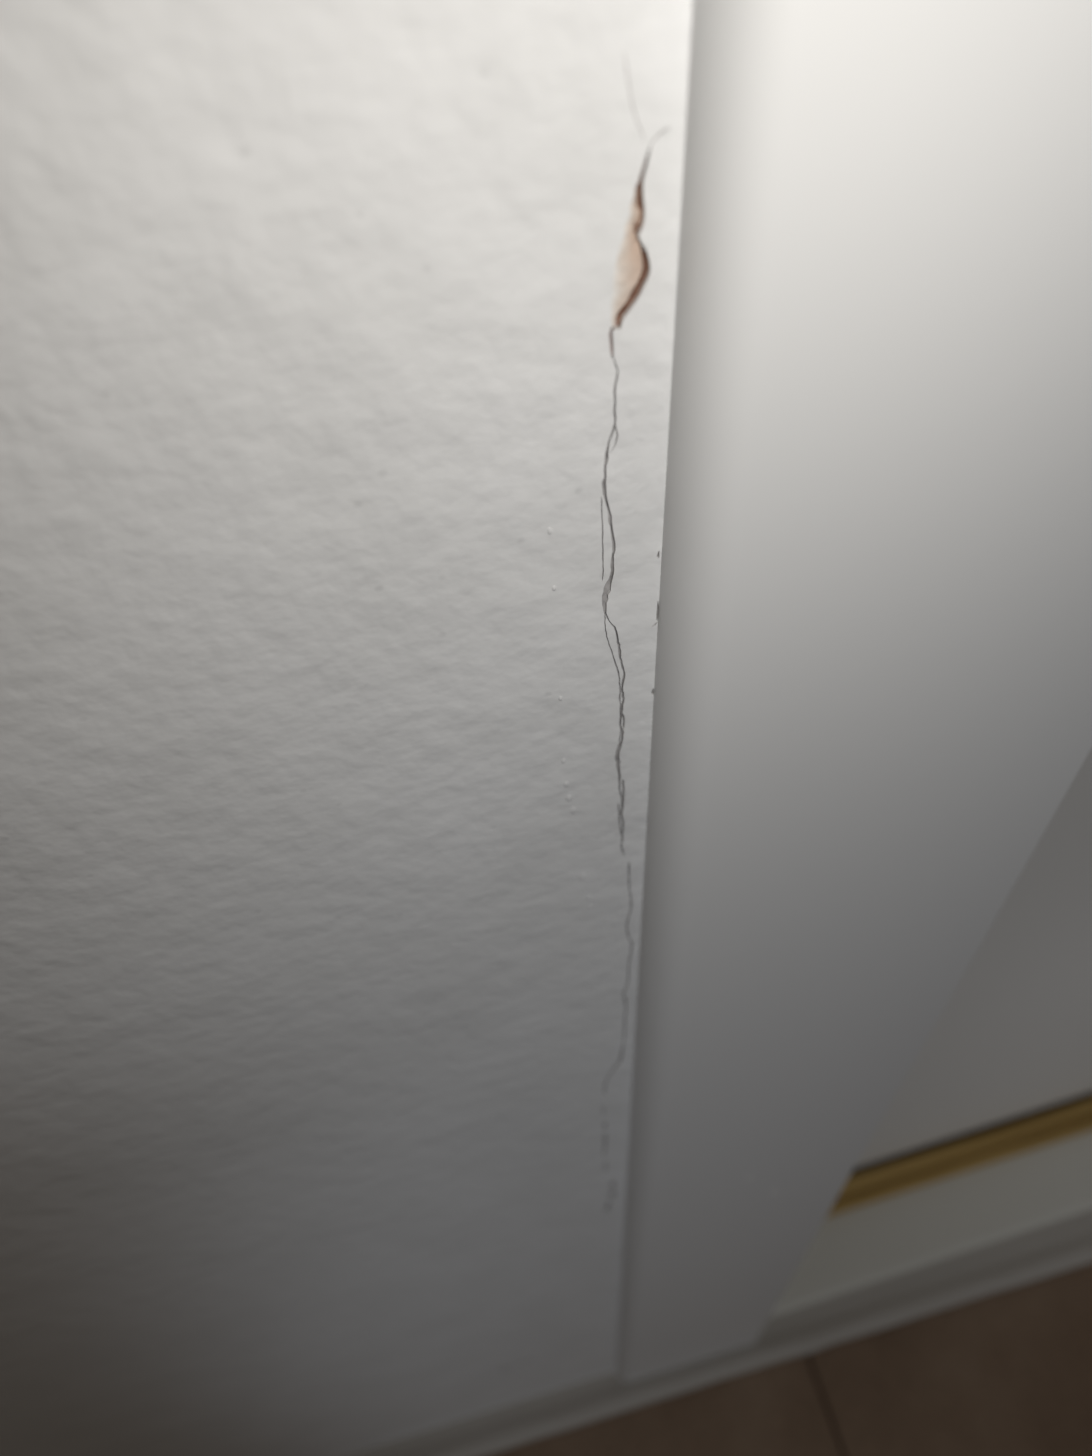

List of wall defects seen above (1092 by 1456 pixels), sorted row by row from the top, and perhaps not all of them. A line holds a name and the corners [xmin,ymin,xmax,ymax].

spalling [609,159,648,357]
crack [601,355,632,1171]